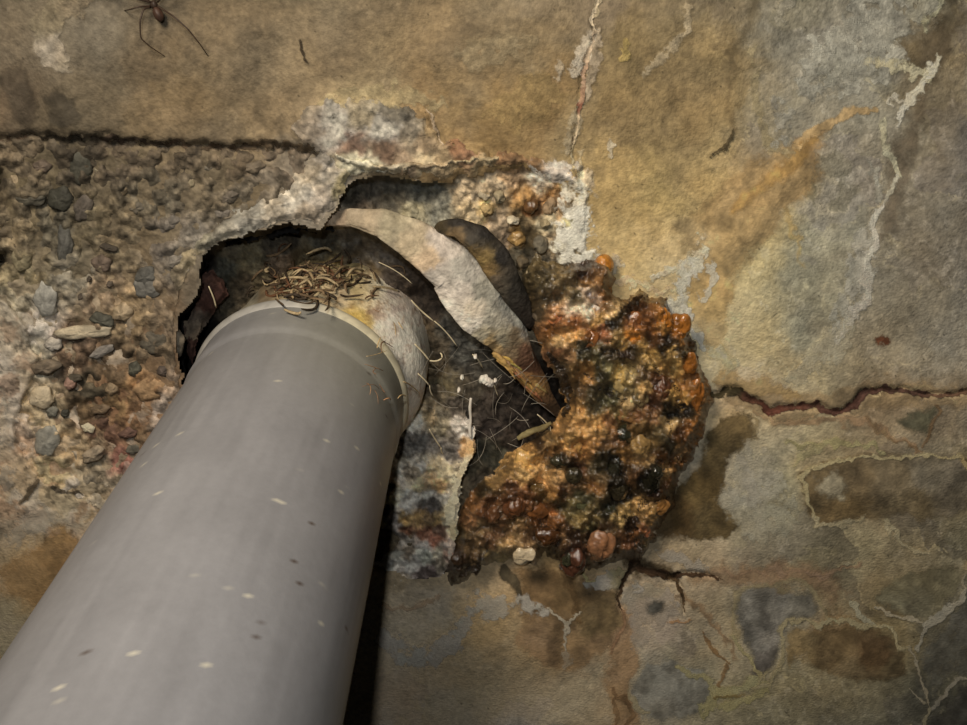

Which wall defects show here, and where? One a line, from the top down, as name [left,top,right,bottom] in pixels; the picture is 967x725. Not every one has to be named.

damp [0,526,78,602]
spalling [0,133,504,509]
spalling [372,382,476,586]
damp [375,149,967,671]
crack [616,558,744,700]
corrosion [674,105,878,349]
crack [710,384,967,425]
damp [786,0,965,384]